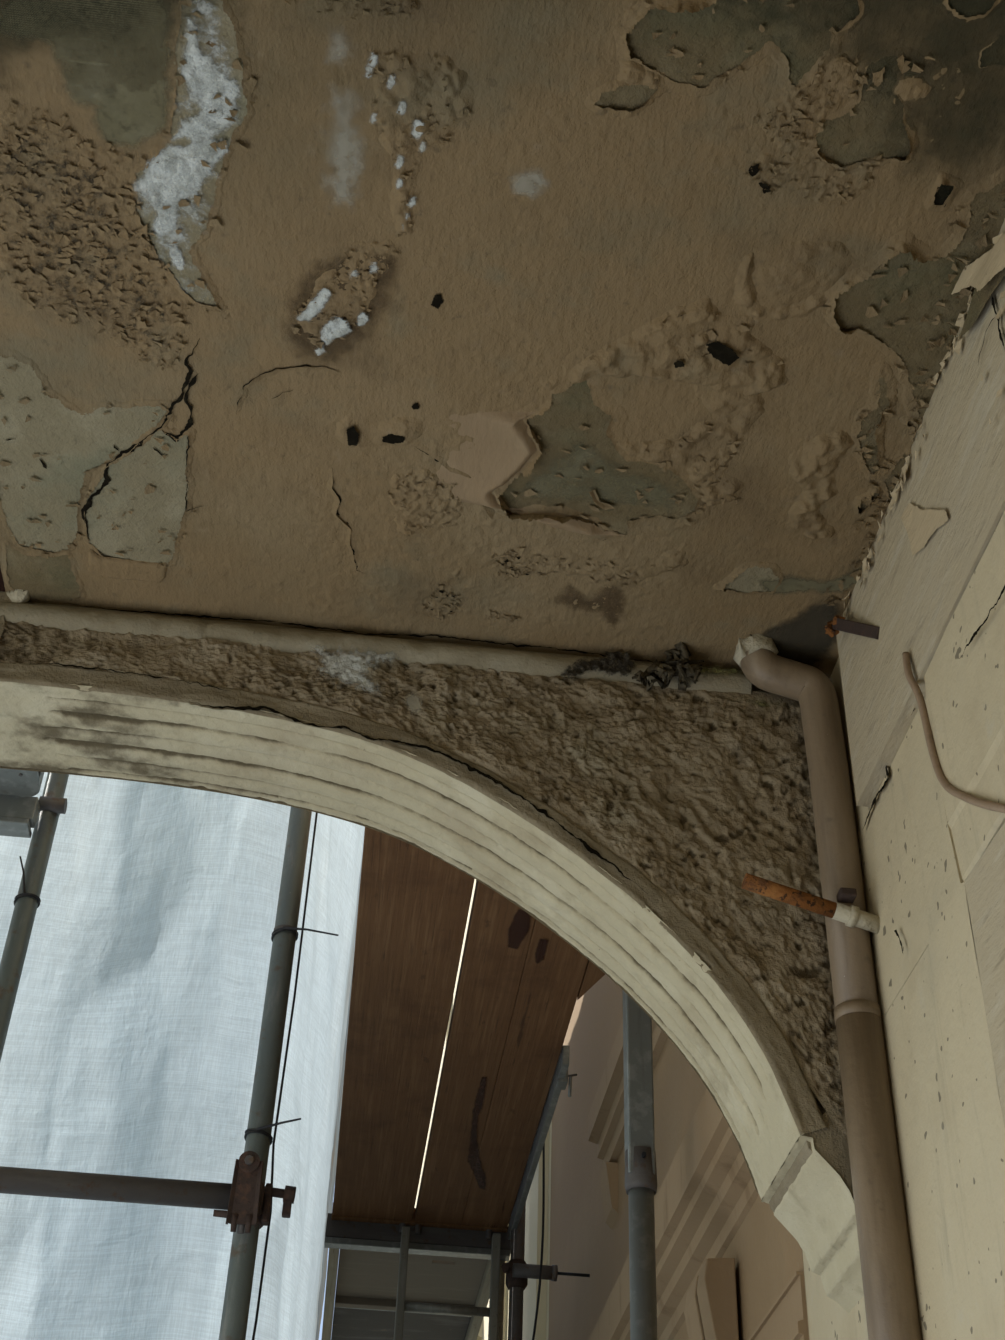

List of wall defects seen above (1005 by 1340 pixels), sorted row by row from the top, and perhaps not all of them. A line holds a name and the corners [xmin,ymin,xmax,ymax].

water stain [5,135,164,342]
water stain [0,0,239,270]
peeling [0,0,257,371]
peeling [584,0,871,119]
peeling [797,47,935,173]
peeling [940,0,1001,22]
peeling [0,348,197,601]
crack [81,338,202,541]
peeling [491,346,712,545]
peeling [819,167,1005,606]